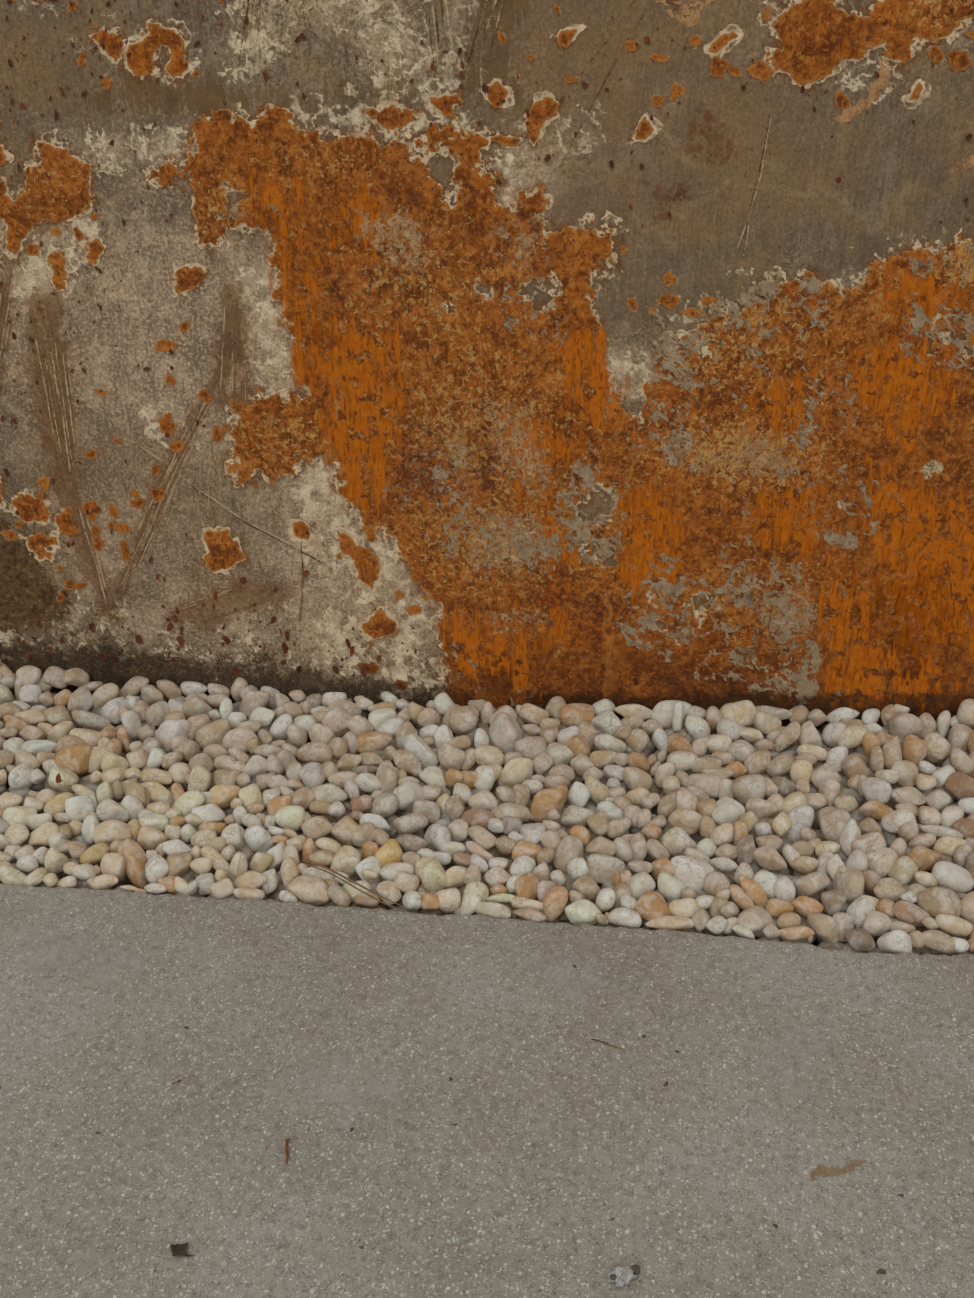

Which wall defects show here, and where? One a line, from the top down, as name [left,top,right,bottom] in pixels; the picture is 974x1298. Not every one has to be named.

rust [549,5,587,49]
peeling [653,0,716,28]
rust [624,0,974,124]
peeling [833,57,896,125]
rust [0,0,205,358]
rust [139,31,974,730]
rust [4,604,194,669]